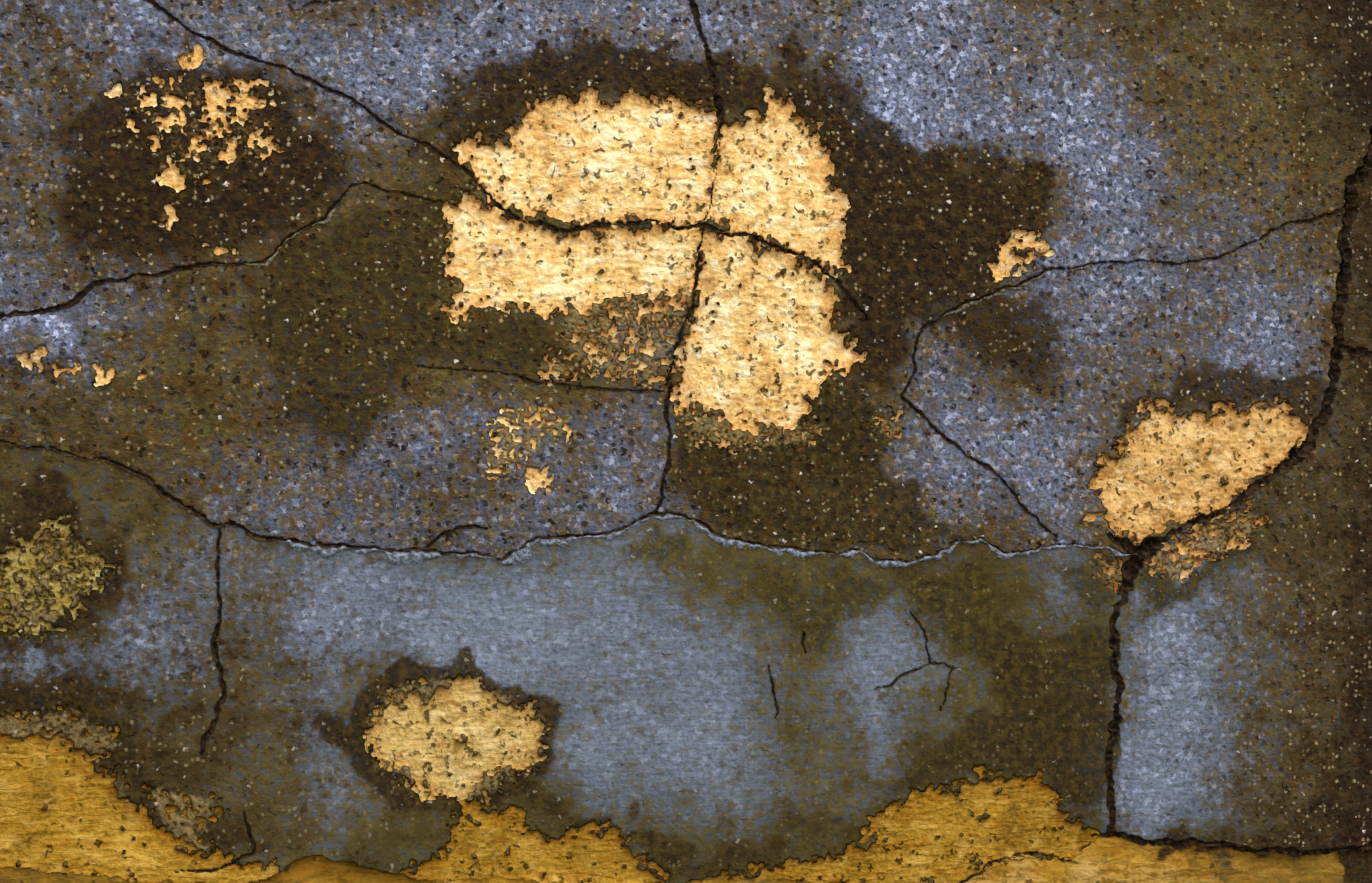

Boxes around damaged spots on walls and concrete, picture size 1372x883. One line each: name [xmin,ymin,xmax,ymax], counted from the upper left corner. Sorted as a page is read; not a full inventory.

spalling [104,44,284,231]
crack [0,182,443,319]
crack [94,0,1131,568]
spalling [440,81,867,494]
damp [611,499,706,571]
crack [901,127,1372,857]
spalling [1083,396,1309,587]
spalling [0,704,279,883]
crack [200,528,226,754]
crack [175,812,256,873]
spalling [363,674,669,883]
damp [309,527,1283,883]